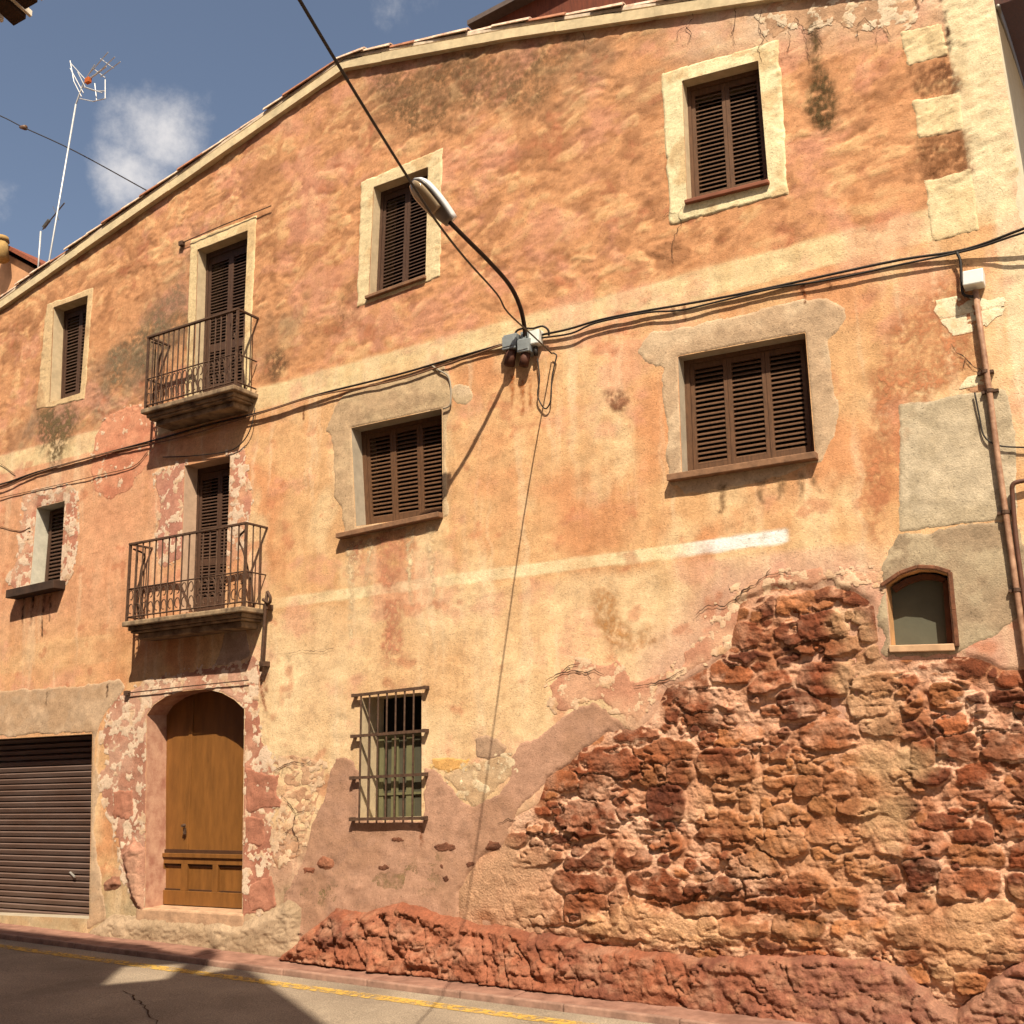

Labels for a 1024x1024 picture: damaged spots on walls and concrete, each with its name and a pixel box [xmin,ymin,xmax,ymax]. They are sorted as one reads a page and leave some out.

peeling [754,0,923,42]
damp [808,23,834,129]
peeling [5,483,80,588]
damp [39,404,76,463]
peeling [89,404,188,568]
peeling [225,445,254,568]
crack [696,570,787,615]
crack [546,663,604,681]
peeling [97,656,334,917]
peeling [430,753,518,807]
spalling [459,565,1024,1009]